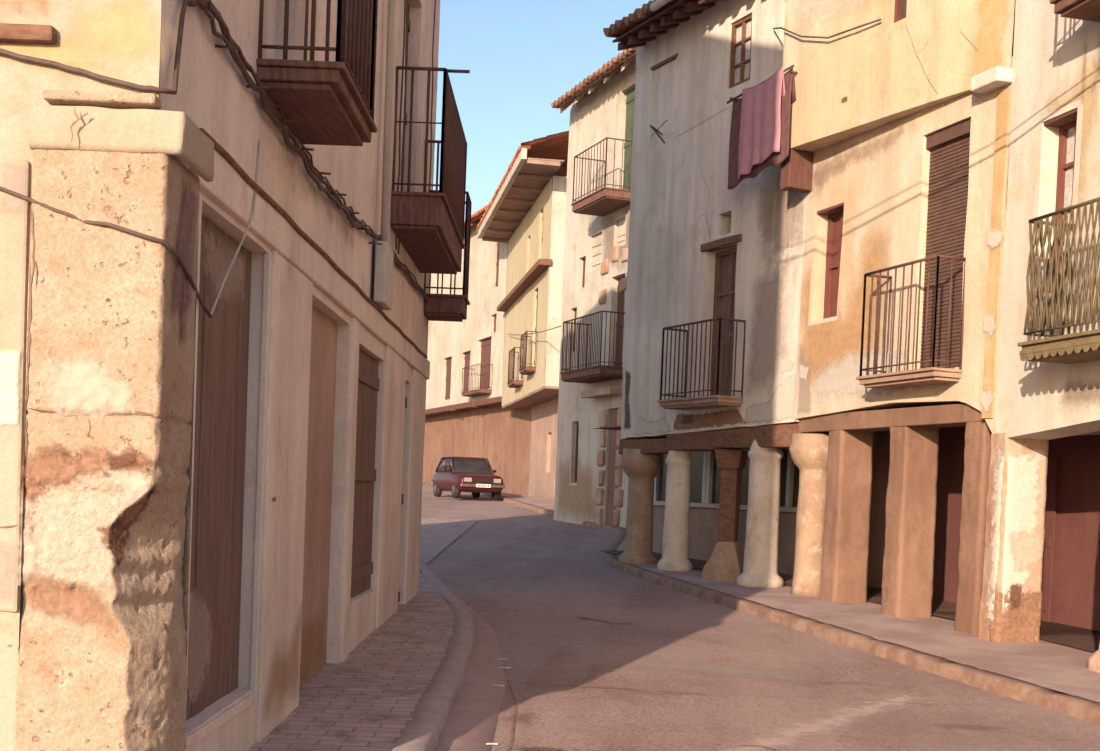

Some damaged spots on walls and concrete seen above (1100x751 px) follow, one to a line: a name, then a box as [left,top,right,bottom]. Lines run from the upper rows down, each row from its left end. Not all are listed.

peeling [4,168,22,208]
peeling [0,350,19,426]
spalling [0,444,151,594]
peeling [986,449,1046,643]